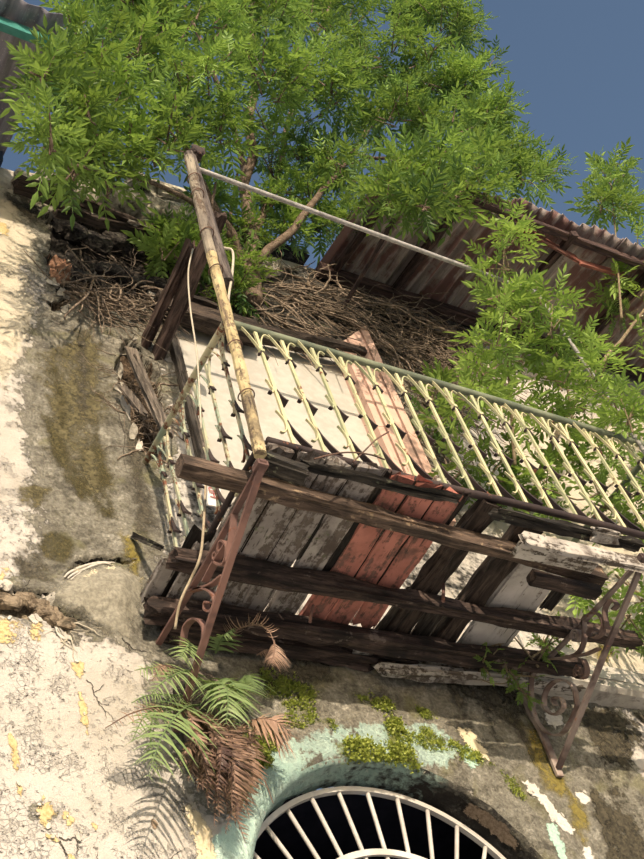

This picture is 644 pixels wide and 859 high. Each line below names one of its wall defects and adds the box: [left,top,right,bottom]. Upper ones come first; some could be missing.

water stain [37,319,115,517]
spalling [64,561,135,580]
spalling [0,567,78,646]
crack [86,680,114,720]
peeling [544,709,565,730]
peeling [458,727,489,769]
peeling [184,804,217,859]
spalling [463,798,522,850]
peeling [521,780,575,859]
peeling [575,790,591,804]
peeling [582,846,595,859]
water stain [582,707,644,859]